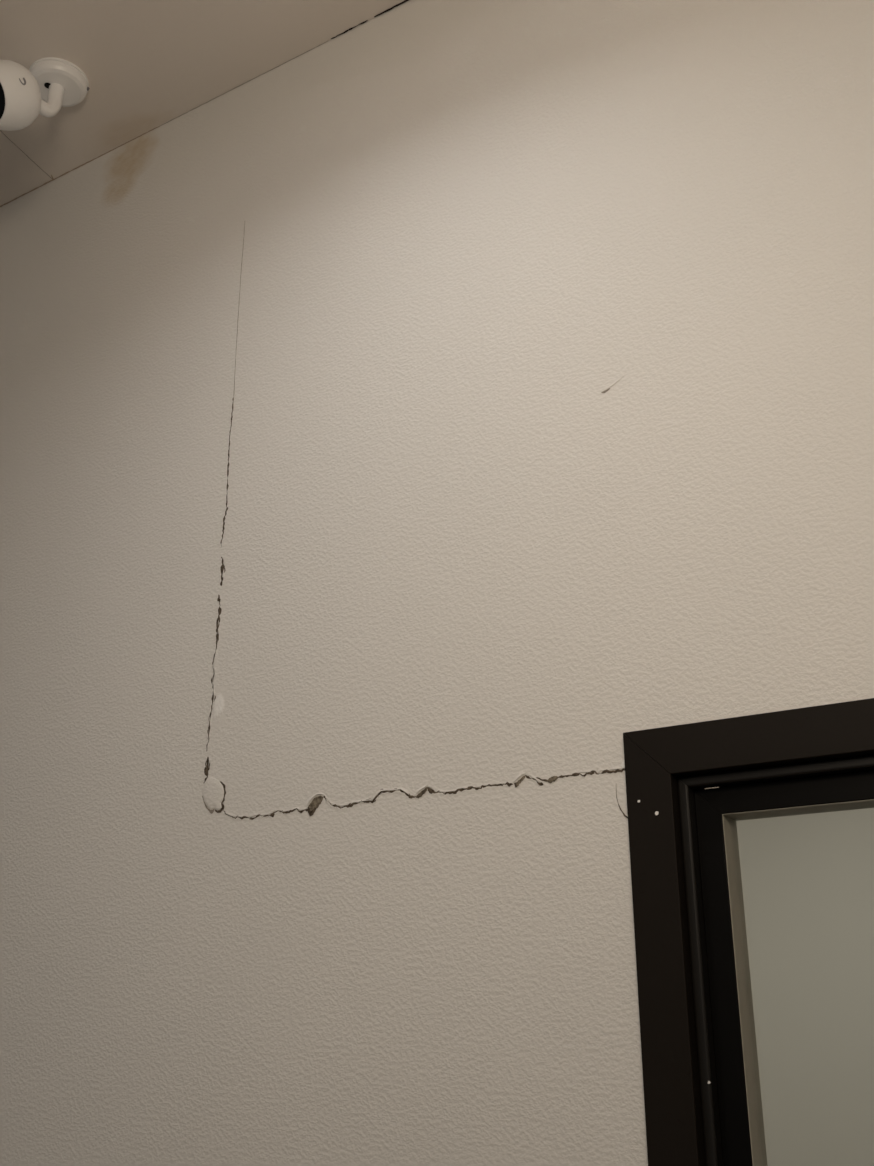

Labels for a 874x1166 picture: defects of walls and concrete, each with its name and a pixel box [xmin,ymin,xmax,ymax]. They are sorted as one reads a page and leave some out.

crack [202,224,245,783]
crack [223,766,628,821]